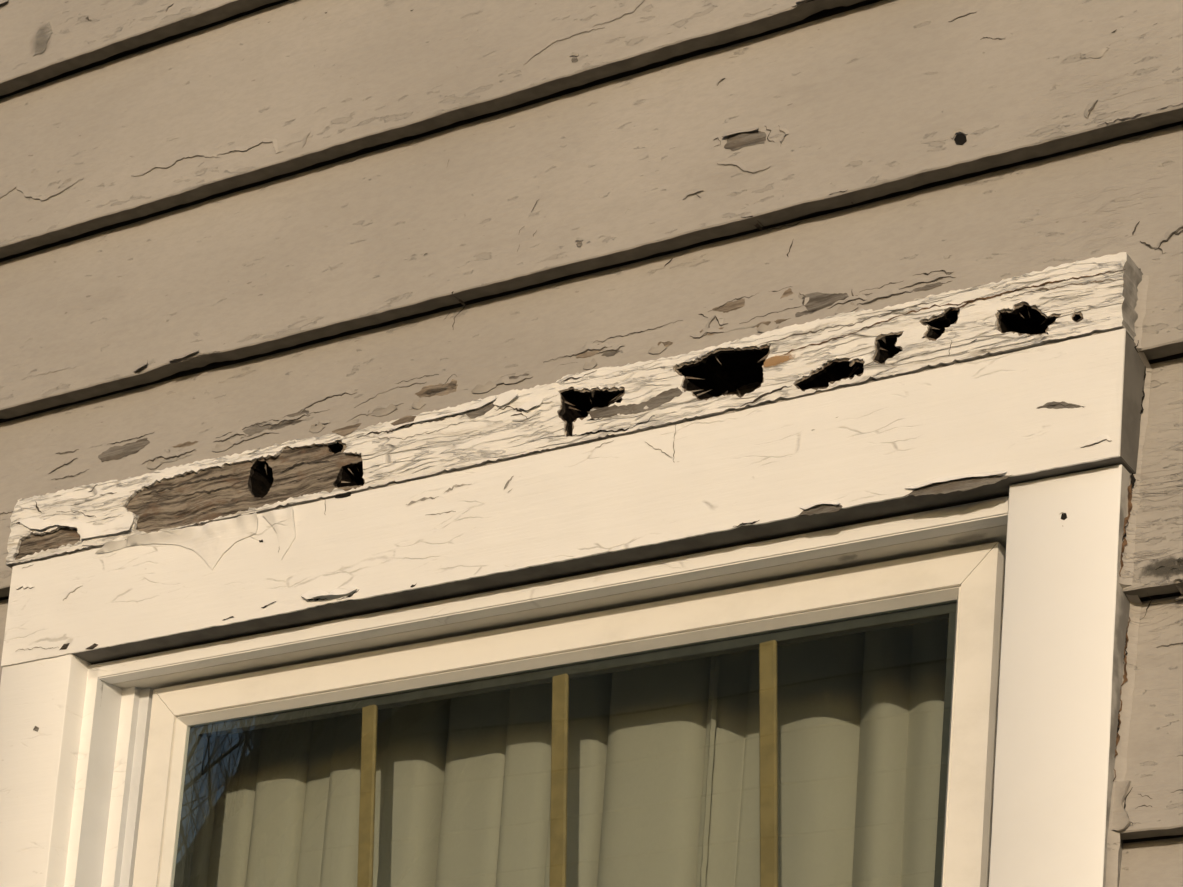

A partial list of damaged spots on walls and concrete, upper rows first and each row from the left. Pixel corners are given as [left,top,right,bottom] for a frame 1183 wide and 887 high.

peeling [714,125,789,173]
peeling [691,270,955,338]
peeling [551,342,625,381]
peeling [648,341,673,354]
peeling [17,502,134,539]